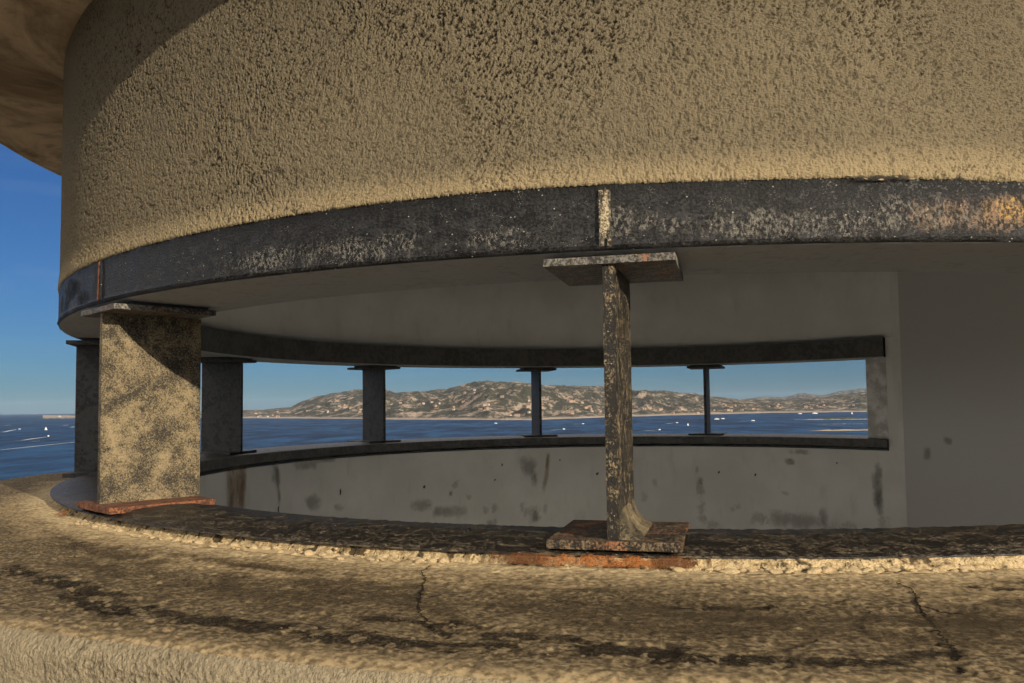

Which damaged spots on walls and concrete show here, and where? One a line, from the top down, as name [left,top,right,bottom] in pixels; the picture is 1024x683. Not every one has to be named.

rust [488,553,698,568]
crack [415,566,436,634]
crack [896,582,981,673]